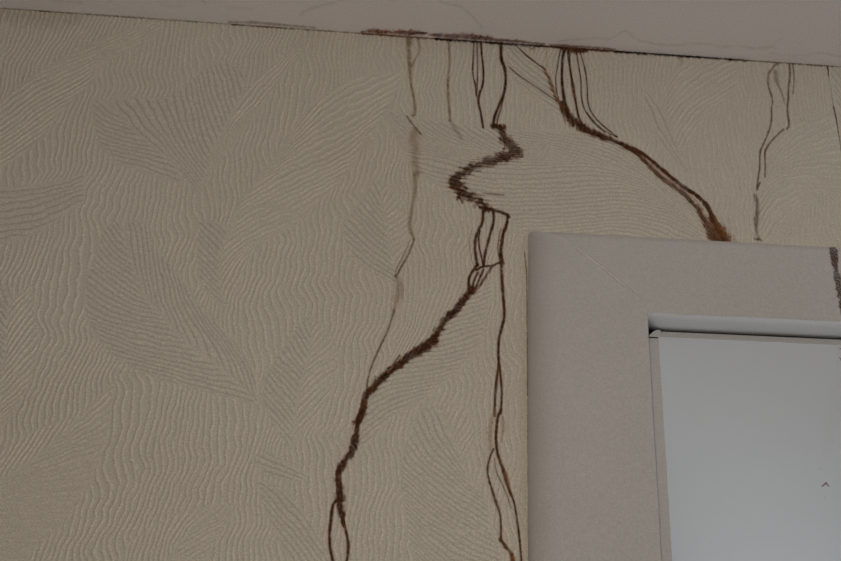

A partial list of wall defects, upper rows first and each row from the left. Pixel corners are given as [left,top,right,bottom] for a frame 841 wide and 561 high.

crack [523,333,531,396]